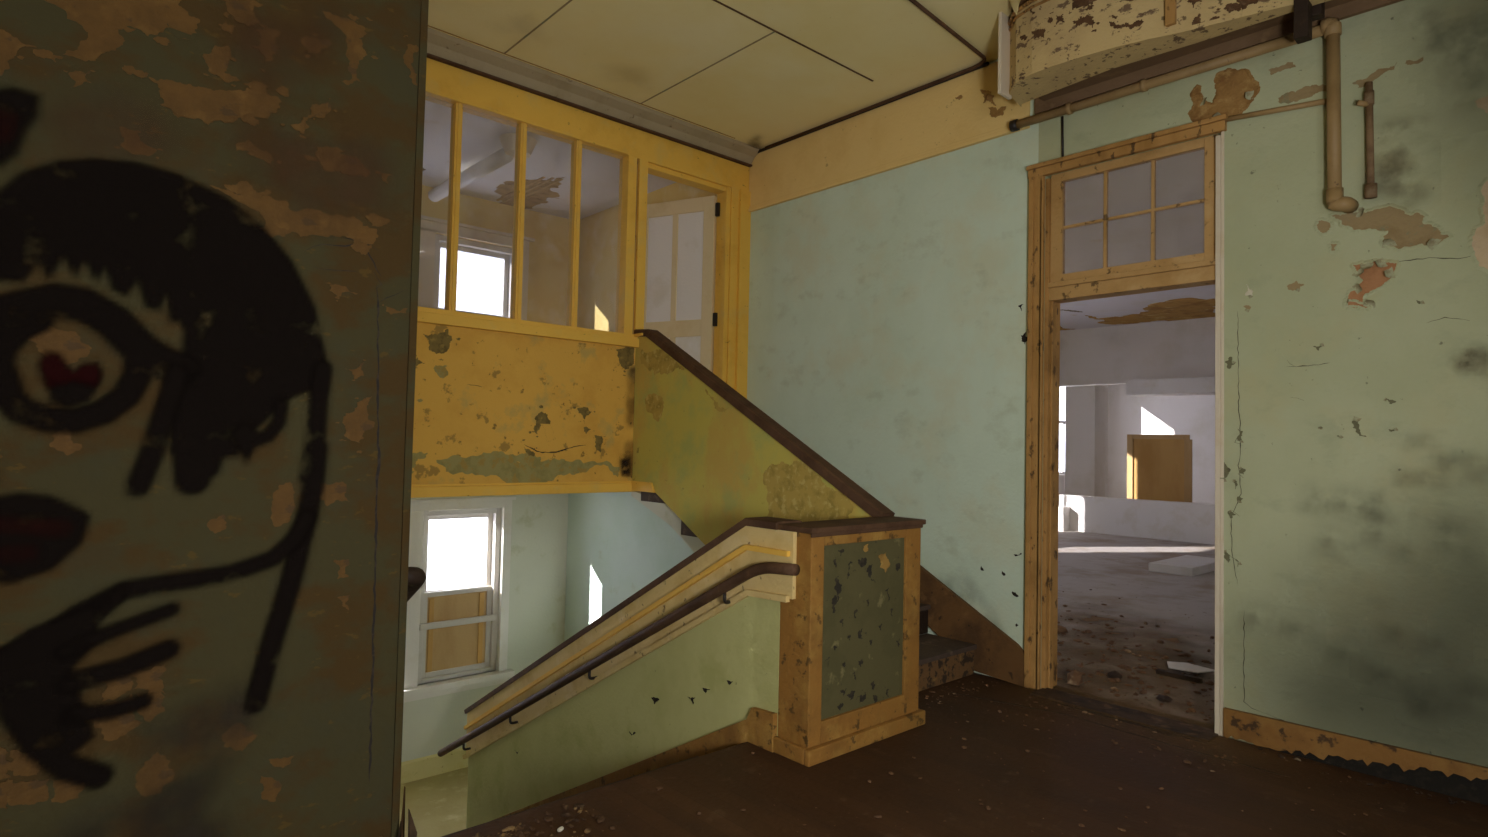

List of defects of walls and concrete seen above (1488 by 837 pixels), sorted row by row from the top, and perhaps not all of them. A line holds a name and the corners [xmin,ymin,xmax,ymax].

peeling [1020,0,1144,41]
peeling [1187,0,1258,25]
peeling [0,0,337,139]
spalling [1188,62,1296,122]
peeling [1278,84,1326,104]
peeling [210,181,390,255]
peeling [1313,203,1454,312]
peeling [416,329,461,378]
peeling [412,405,620,483]
crack [1231,311,1243,584]
peeling [826,544,900,710]
crack [1243,618,1284,721]